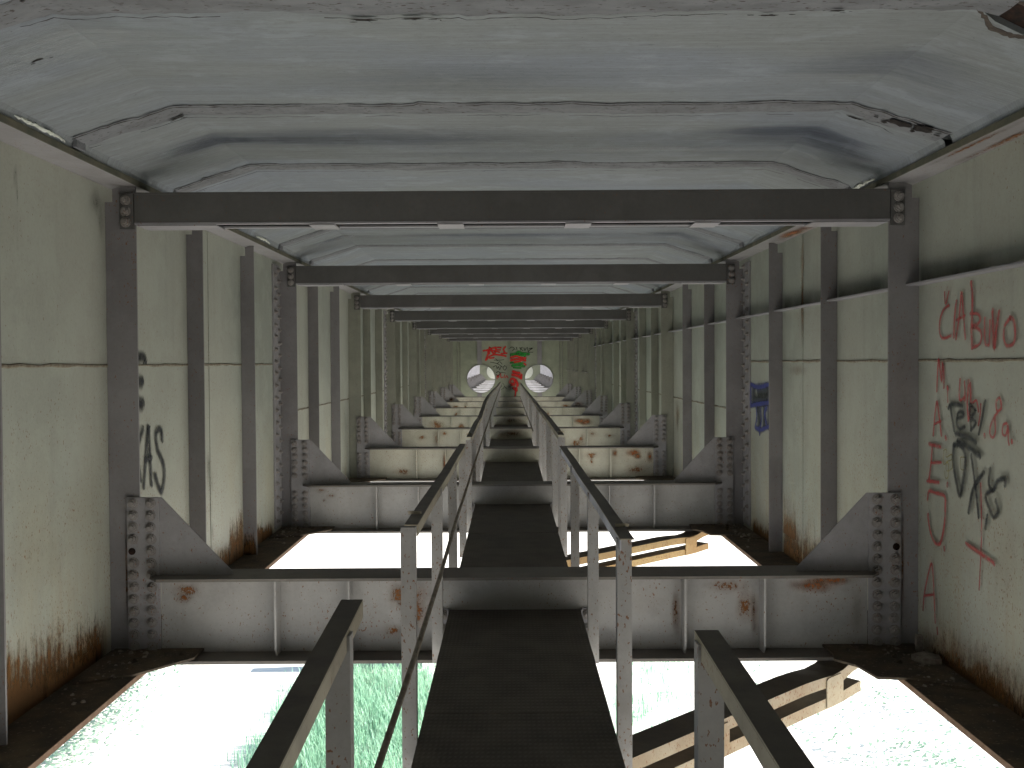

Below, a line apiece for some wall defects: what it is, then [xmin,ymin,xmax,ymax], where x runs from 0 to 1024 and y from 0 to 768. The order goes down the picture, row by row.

spalling [846,115,940,137]
rust [219,517,272,566]
rust [783,518,816,564]
rust [7,625,104,725]
rust [932,636,1024,719]